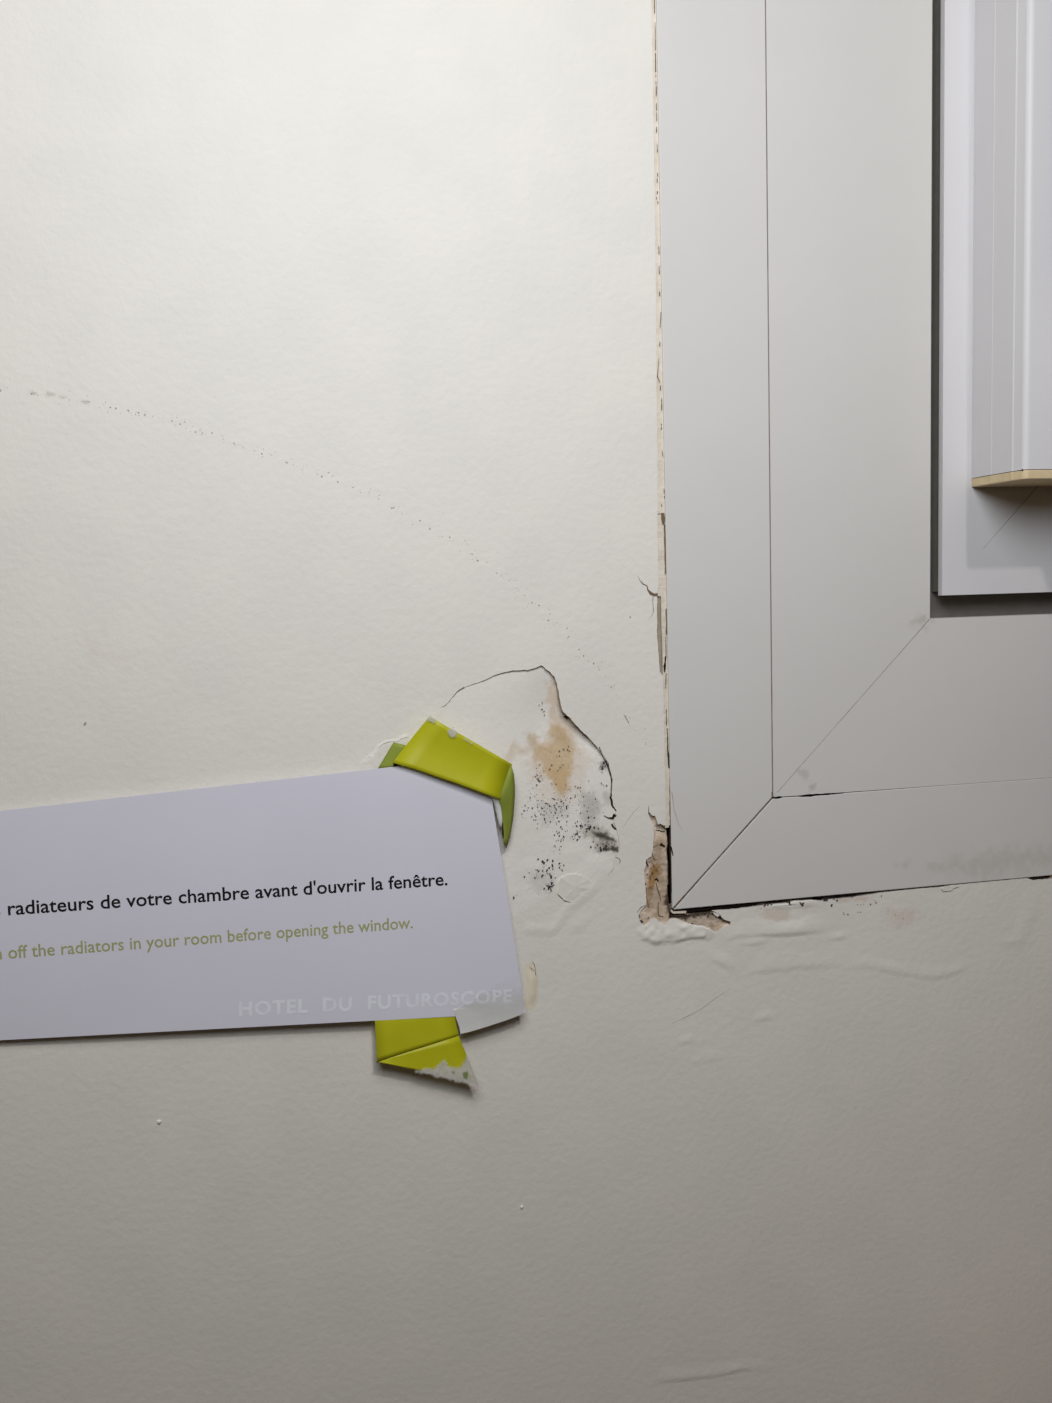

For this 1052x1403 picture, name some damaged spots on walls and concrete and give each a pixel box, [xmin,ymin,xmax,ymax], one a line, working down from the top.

peeling [443,665,621,915]
water stain [522,746,618,892]
spalling [638,812,730,932]